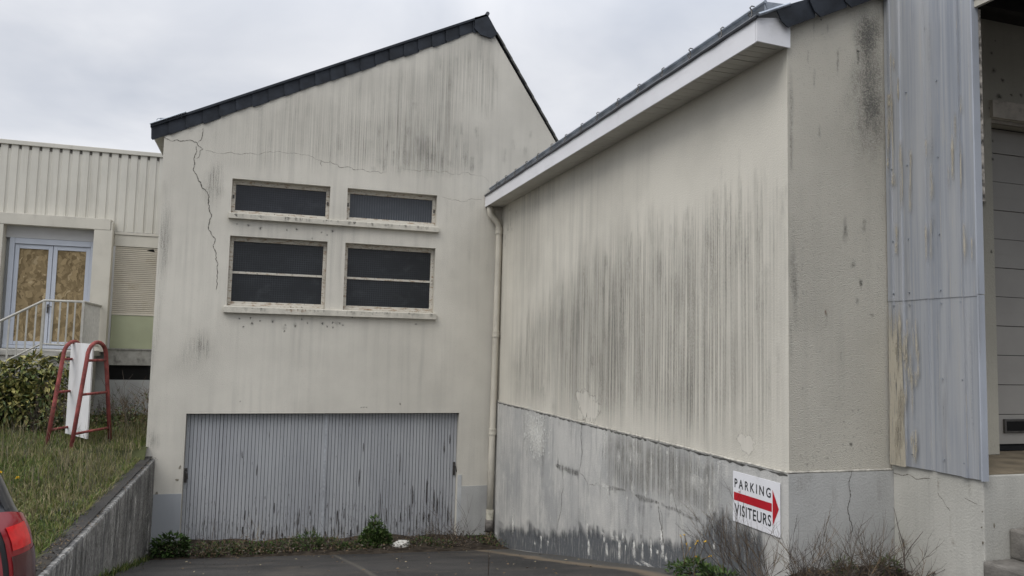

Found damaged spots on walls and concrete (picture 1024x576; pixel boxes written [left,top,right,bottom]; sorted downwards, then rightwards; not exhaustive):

crack [164,132,383,288]
peeling [889,316,919,467]
leakage [499,516,763,576]